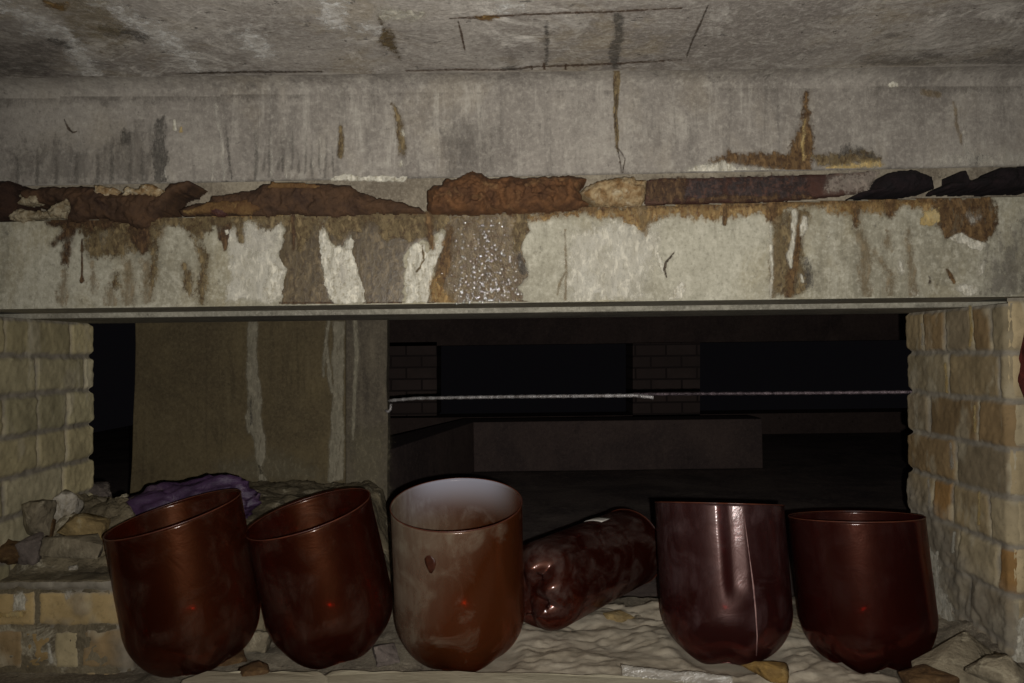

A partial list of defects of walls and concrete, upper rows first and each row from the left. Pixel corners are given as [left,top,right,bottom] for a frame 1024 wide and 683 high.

rust [378,17,400,59]
crack [406,5,709,173]
leakage [226,211,530,305]
rust [0,91,998,305]